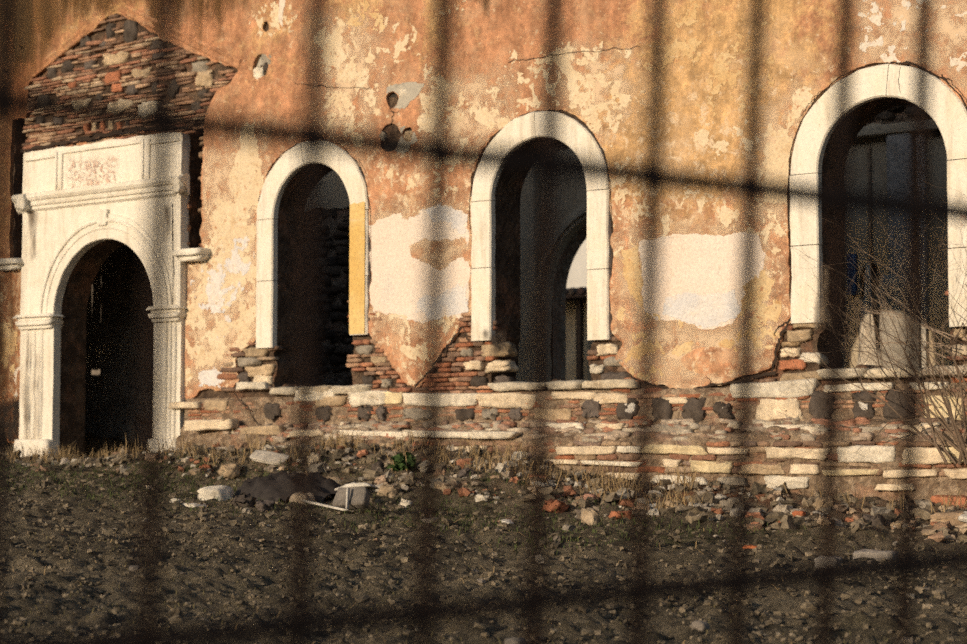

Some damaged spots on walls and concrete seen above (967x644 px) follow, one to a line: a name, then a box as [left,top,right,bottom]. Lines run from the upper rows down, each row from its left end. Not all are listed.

flaking render [21,118,147,149]
flaking render [24,14,154,104]
peeling [249,0,298,79]
peeling [325,0,432,130]
peeling [451,50,543,143]
crack [508,46,640,63]
peeling [562,41,646,136]
peeling [858,0,917,64]
peeling [185,143,283,392]
peeling [346,158,428,393]
peeling [658,192,741,330]
flaking render [442,257,519,393]